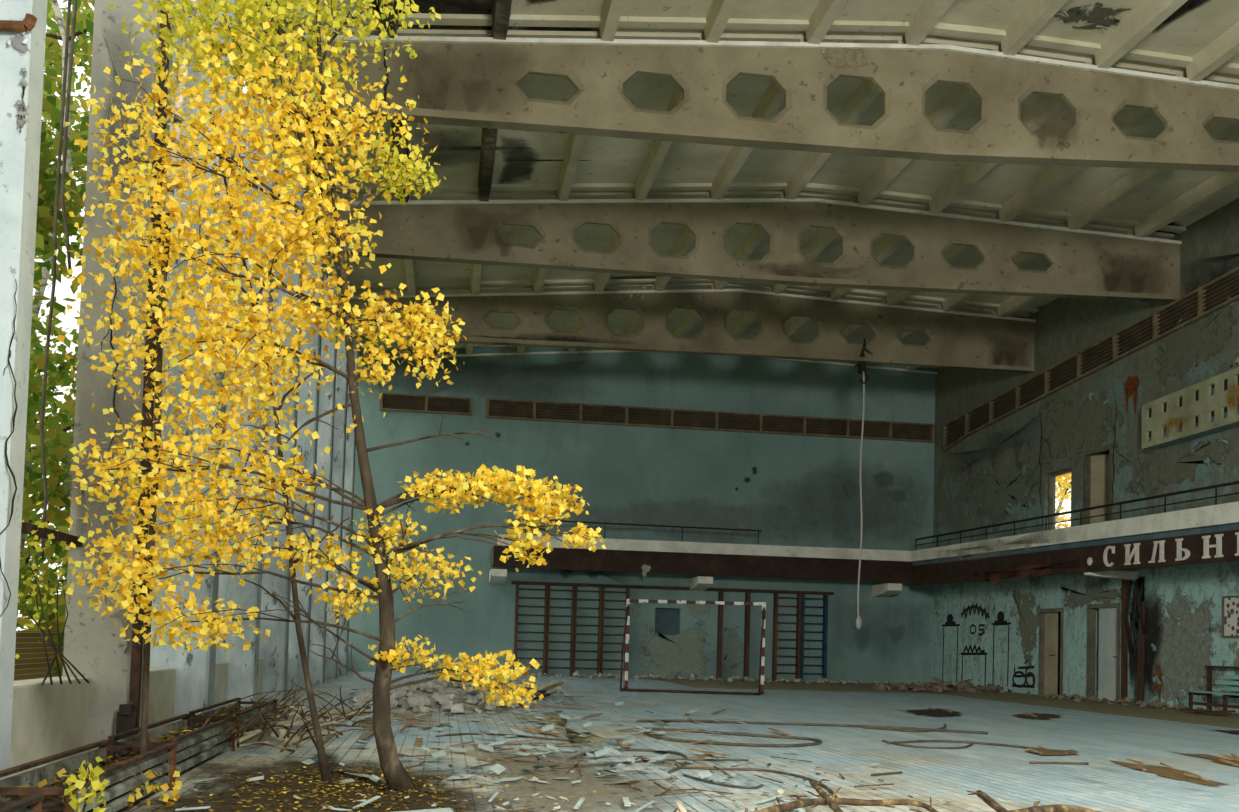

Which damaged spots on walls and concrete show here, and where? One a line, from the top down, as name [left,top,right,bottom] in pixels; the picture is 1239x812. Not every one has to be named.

water stain [425,133,481,162]
water stain [496,140,564,184]
peeling [1013,592,1043,677]
peeling [1150,586,1239,708]